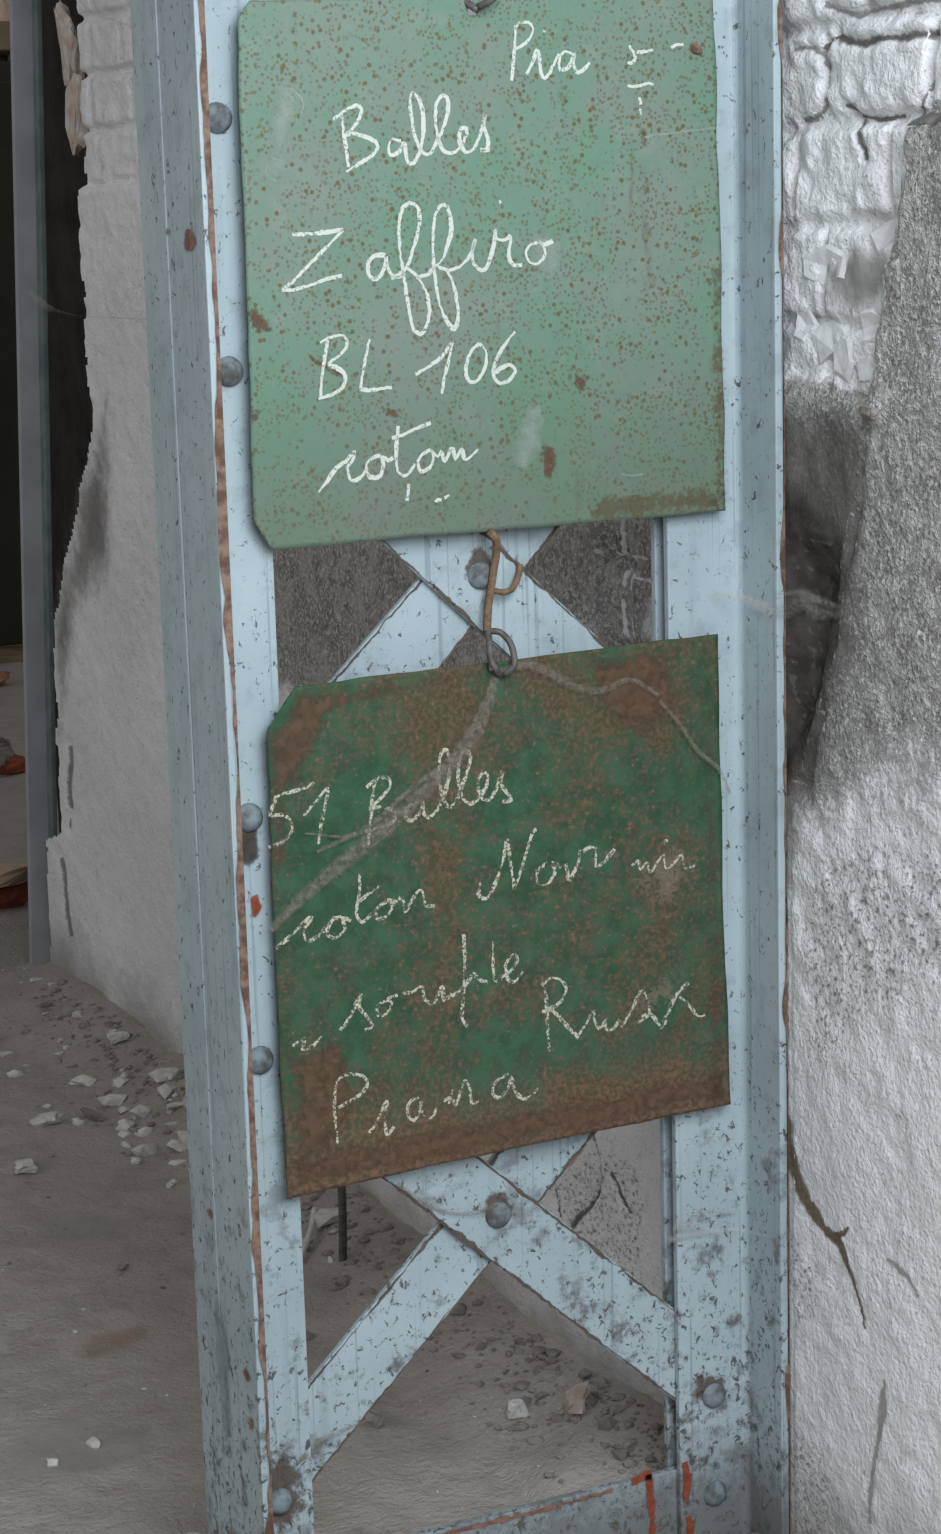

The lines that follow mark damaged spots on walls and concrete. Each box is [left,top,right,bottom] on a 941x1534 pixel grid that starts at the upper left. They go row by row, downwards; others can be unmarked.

rust [166,0,730,1534]
crack [787,1114,866,1329]
crack [887,1257,919,1297]
crack [868,1379,887,1524]